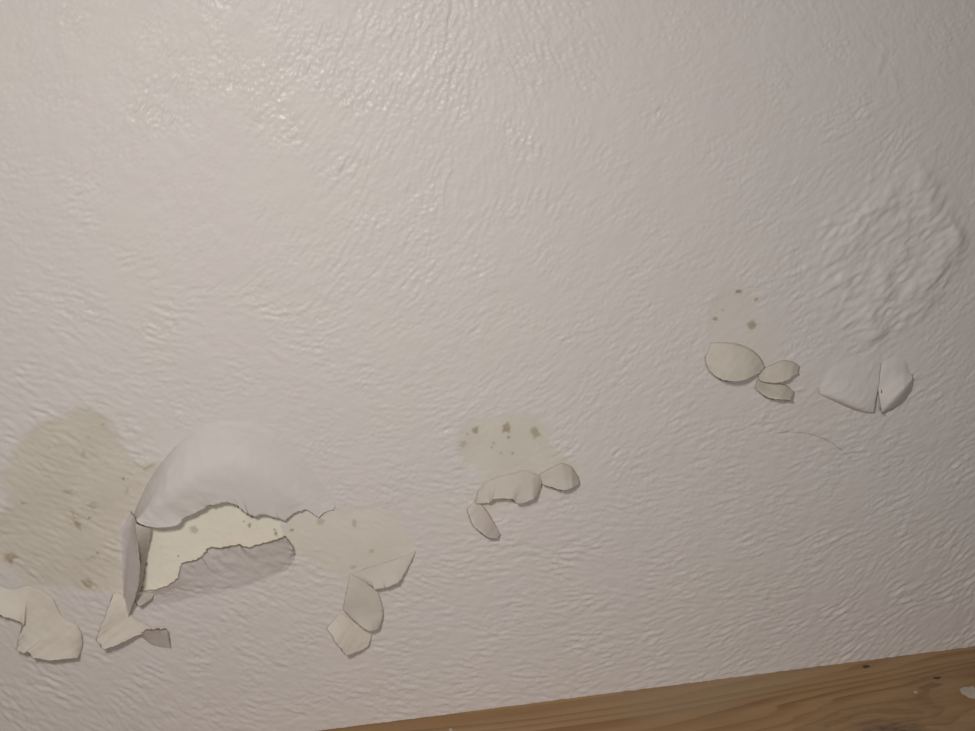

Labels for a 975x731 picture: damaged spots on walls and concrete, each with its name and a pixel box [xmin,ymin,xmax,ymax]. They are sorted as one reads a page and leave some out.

peeling [697,273,800,401]
peeling [818,356,914,415]
peeling [0,401,422,661]
peeling [447,405,591,539]